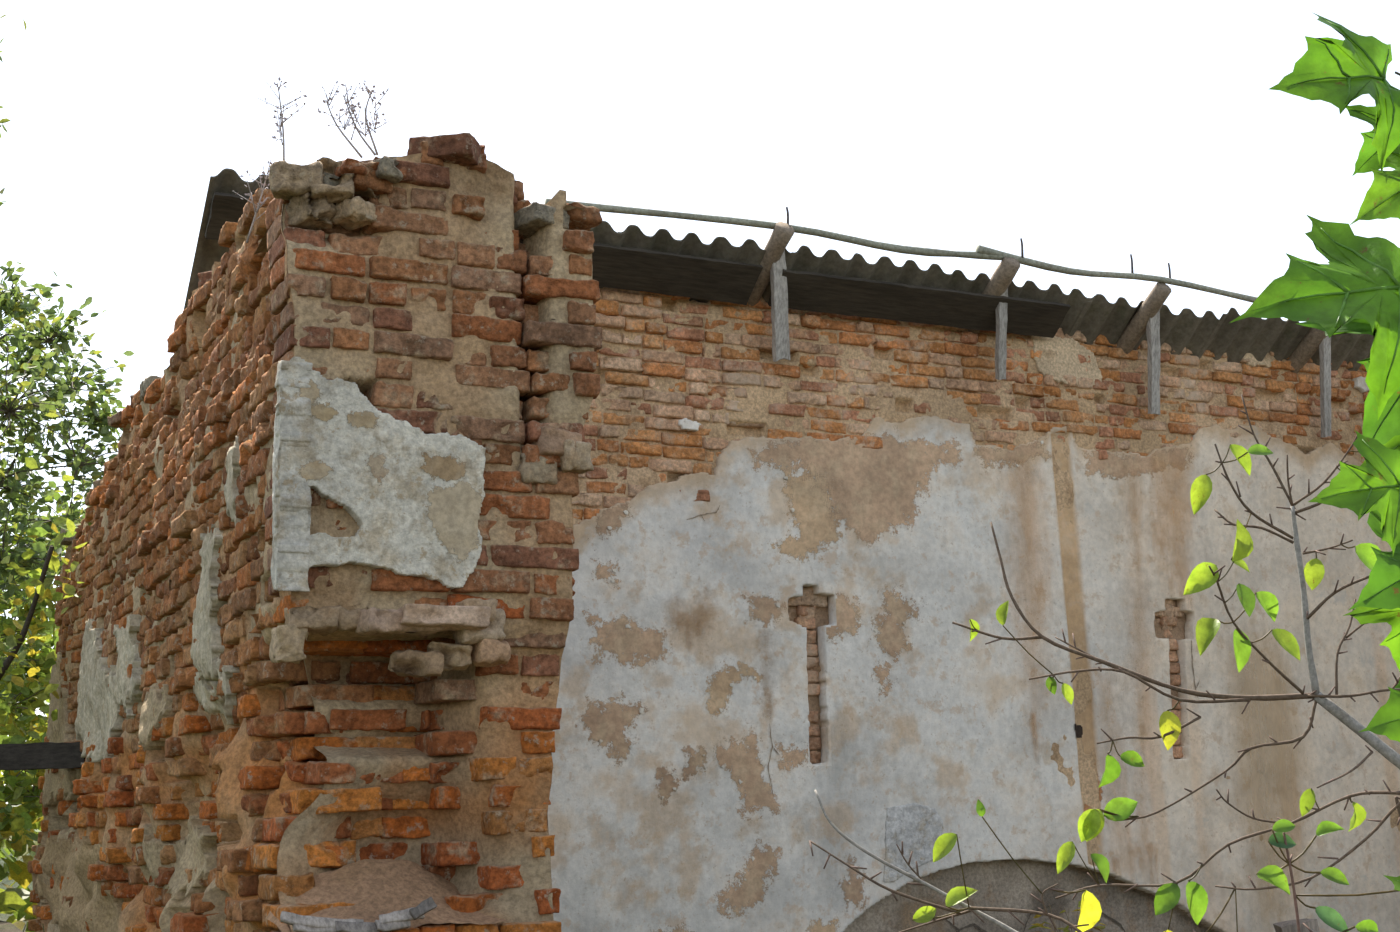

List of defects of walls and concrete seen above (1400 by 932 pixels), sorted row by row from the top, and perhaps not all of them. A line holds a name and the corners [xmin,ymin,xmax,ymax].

spalling [295,379,379,428]
spalling [299,460,334,480]
spalling [365,452,389,486]
spalling [420,452,482,563]
peeling [590,502,632,590]
peeling [575,690,647,765]